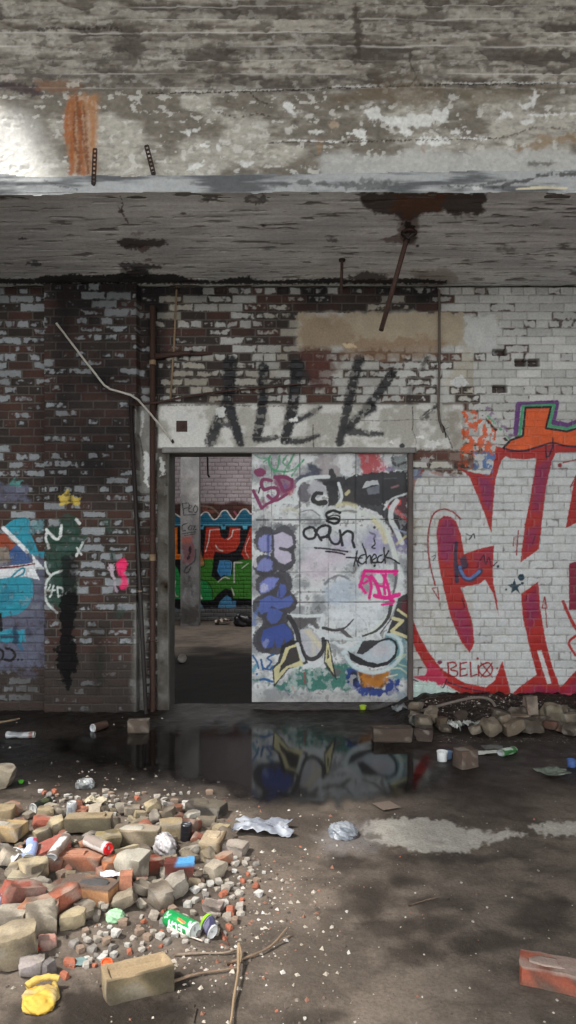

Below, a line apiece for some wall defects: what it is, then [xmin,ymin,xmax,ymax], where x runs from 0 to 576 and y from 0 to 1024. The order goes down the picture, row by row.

rust [57,89,103,176]
peeling [182,124,226,173]
peeling [239,159,255,168]
peeling [282,100,297,116]
peeling [307,104,472,148]
peeling [495,88,576,127]
rust [357,192,490,249]
rust [407,265,462,287]
peeling [449,374,470,388]